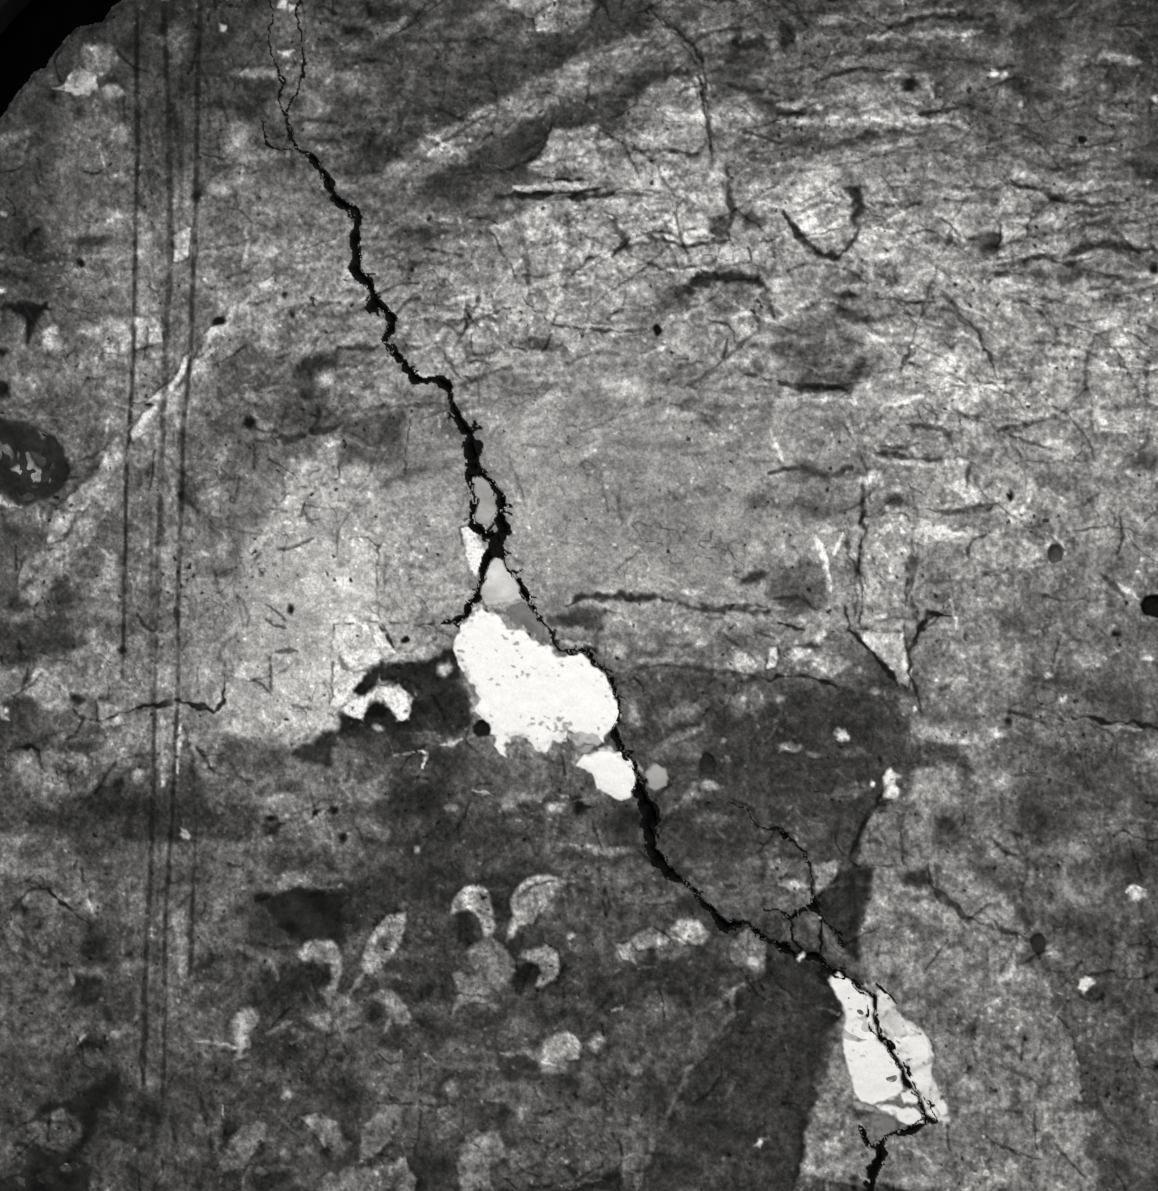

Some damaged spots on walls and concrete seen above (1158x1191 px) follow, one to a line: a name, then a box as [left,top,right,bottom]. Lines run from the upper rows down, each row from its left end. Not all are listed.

crack [261,0,943,1191]